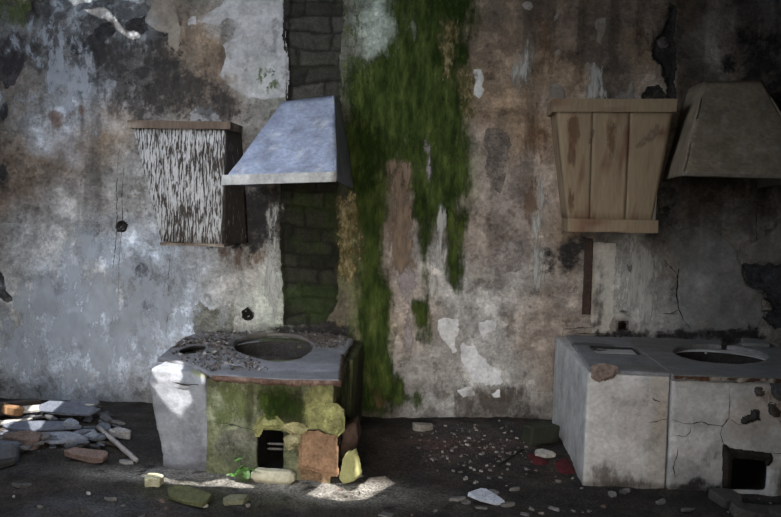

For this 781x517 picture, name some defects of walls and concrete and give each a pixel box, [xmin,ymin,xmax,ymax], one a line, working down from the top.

leakage [0,0,240,121]
spalling [641,3,678,99]
spalling [0,272,19,303]
leakage [349,158,531,419]
crack [662,258,691,329]
spalling [742,262,781,330]